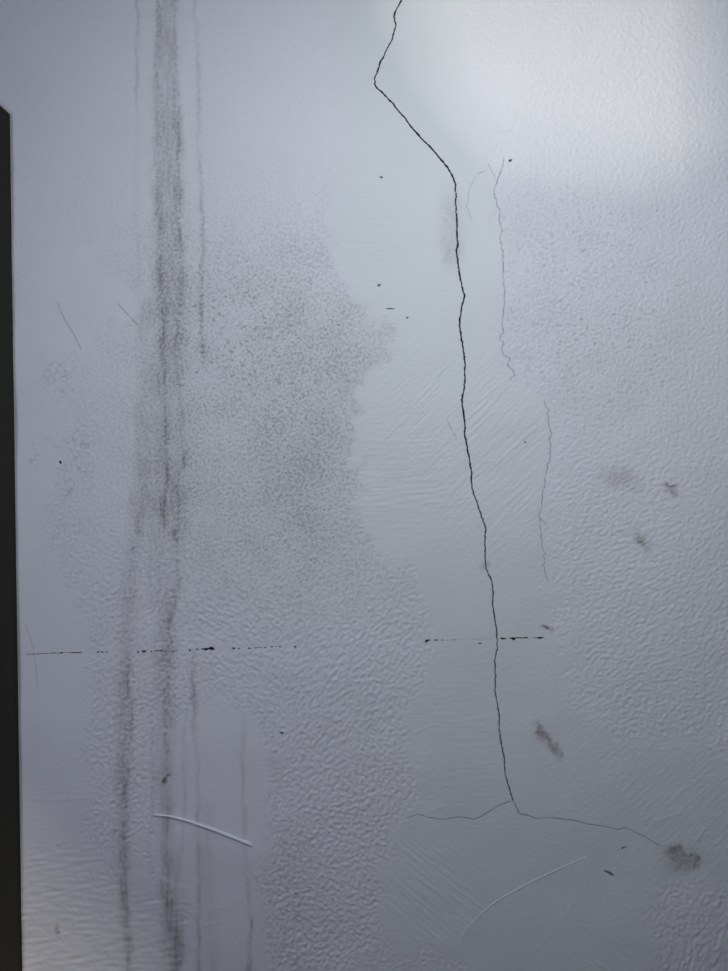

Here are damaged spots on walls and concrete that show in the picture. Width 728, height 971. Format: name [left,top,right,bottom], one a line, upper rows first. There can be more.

crack [374,0,662,847]